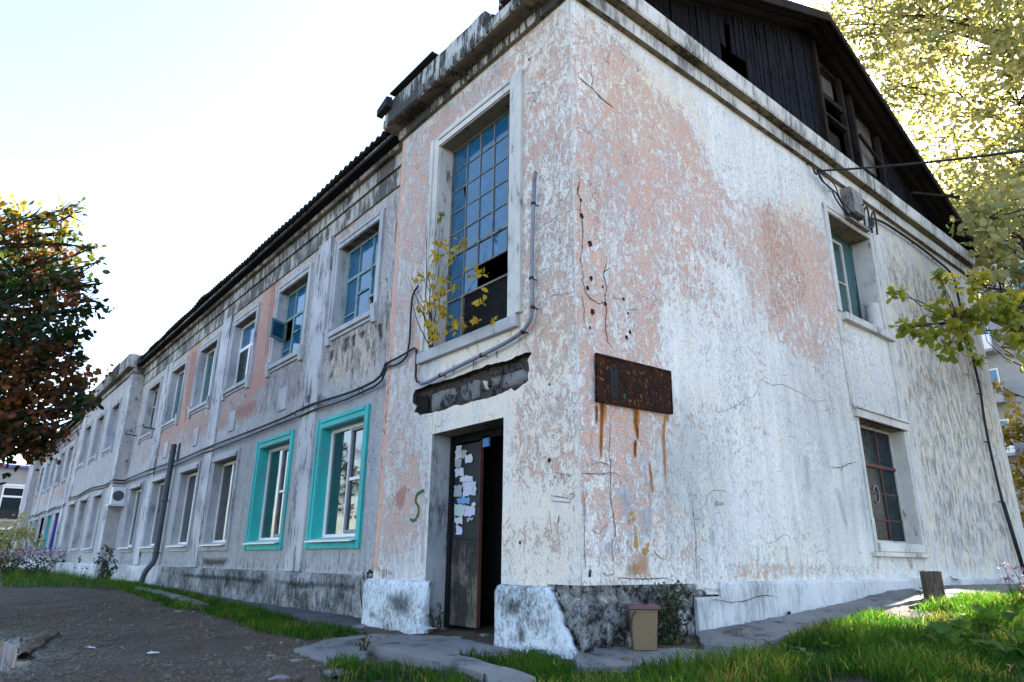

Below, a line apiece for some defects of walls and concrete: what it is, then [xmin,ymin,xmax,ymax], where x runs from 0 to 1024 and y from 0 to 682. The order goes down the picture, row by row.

crack [527,65,612,107]
crack [539,176,638,351]
flaking render [413,352,531,415]
rust [595,403,607,457]
rust [649,415,669,493]
crack [554,408,670,580]
damp [185,559,261,583]